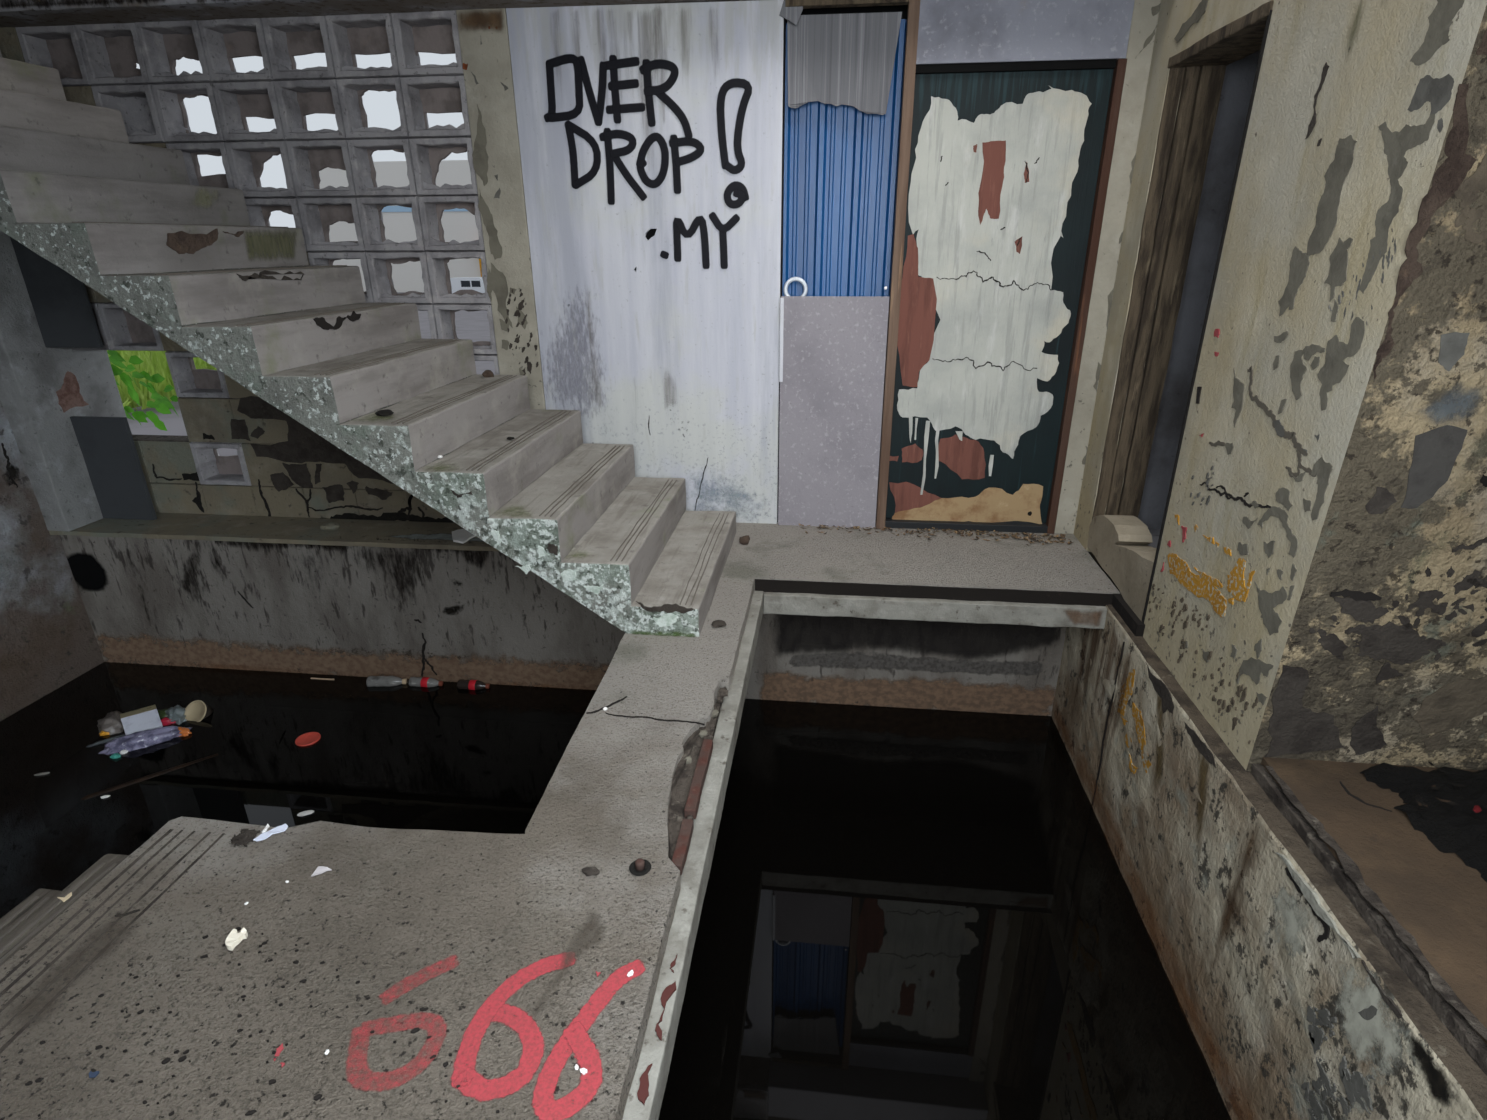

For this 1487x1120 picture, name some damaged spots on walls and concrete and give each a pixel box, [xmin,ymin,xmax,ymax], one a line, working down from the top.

peeling [973,140,1006,224]
spalling [1273,0,1477,437]
crack [258,479,454,523]
crack [1209,439,1225,447]
crack [1200,482,1271,508]
crack [1247,366,1316,478]
damp [182,530,502,601]
spalling [59,529,625,686]
damp [97,586,610,690]
spalling [663,425,1487,1120]
damp [1219,835,1256,940]
damp [1336,967,1455,1111]